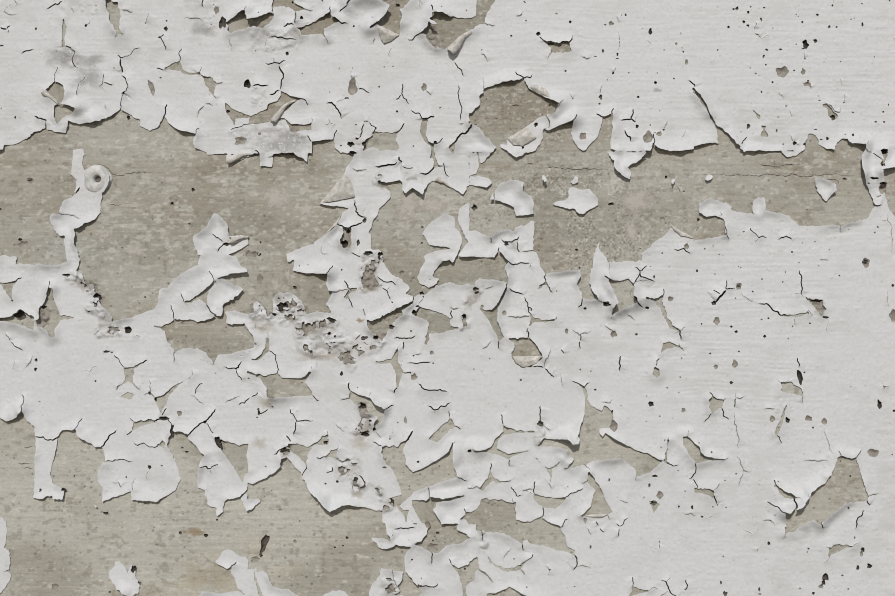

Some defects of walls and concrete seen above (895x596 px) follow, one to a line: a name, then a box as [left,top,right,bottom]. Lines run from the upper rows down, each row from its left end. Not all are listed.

crack [327,76,369,125]
crack [455,63,463,124]
peeling [536,32,574,59]
spalling [763,39,817,87]
crack [354,157,411,171]
peeling [0,48,895,401]
crack [713,281,750,303]
crack [225,355,268,414]
crack [396,336,449,413]
peeling [770,370,806,443]
peeling [0,350,729,596]
peeling [768,449,879,538]